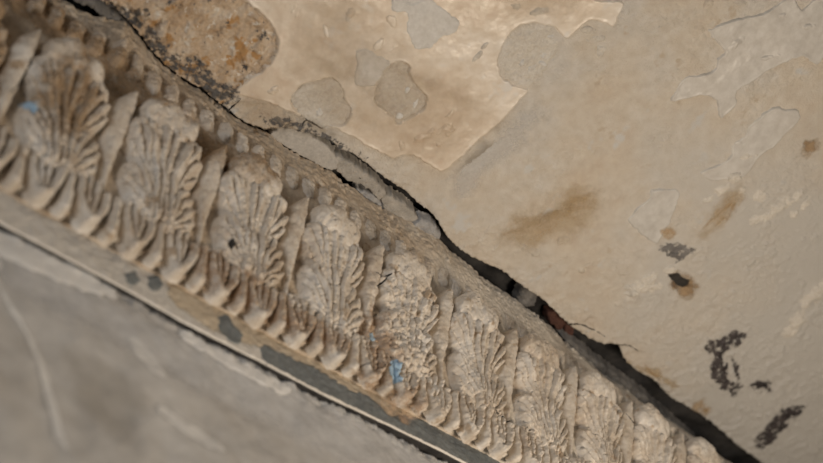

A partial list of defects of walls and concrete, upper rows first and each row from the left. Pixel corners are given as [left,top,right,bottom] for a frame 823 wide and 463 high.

crack [65,0,386,209]
peeling [102,0,624,171]
peeling [670,0,823,118]
crack [0,224,461,463]
crack [352,153,761,463]
peeling [628,188,680,244]
water stain [659,242,695,263]
rust [672,275,698,297]
water stain [704,330,772,397]
water stain [754,405,805,449]